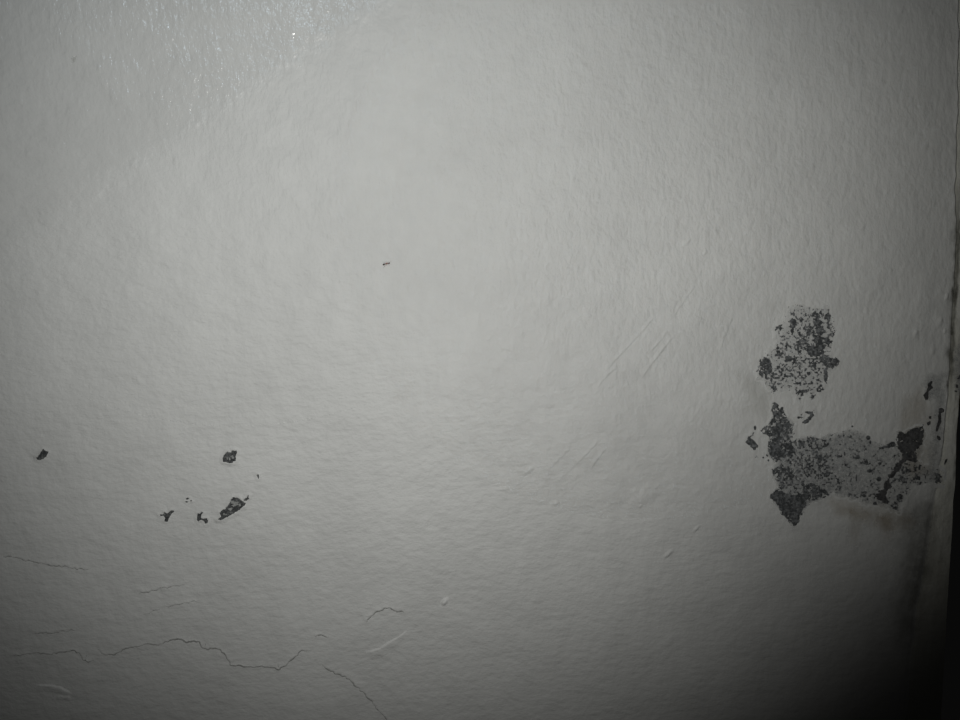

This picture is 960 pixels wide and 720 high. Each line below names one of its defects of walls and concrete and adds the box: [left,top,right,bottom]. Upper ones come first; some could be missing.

peeling [741,300,947,532]
peeling [33,445,52,464]
peeling [219,446,241,467]
peeling [156,490,254,527]